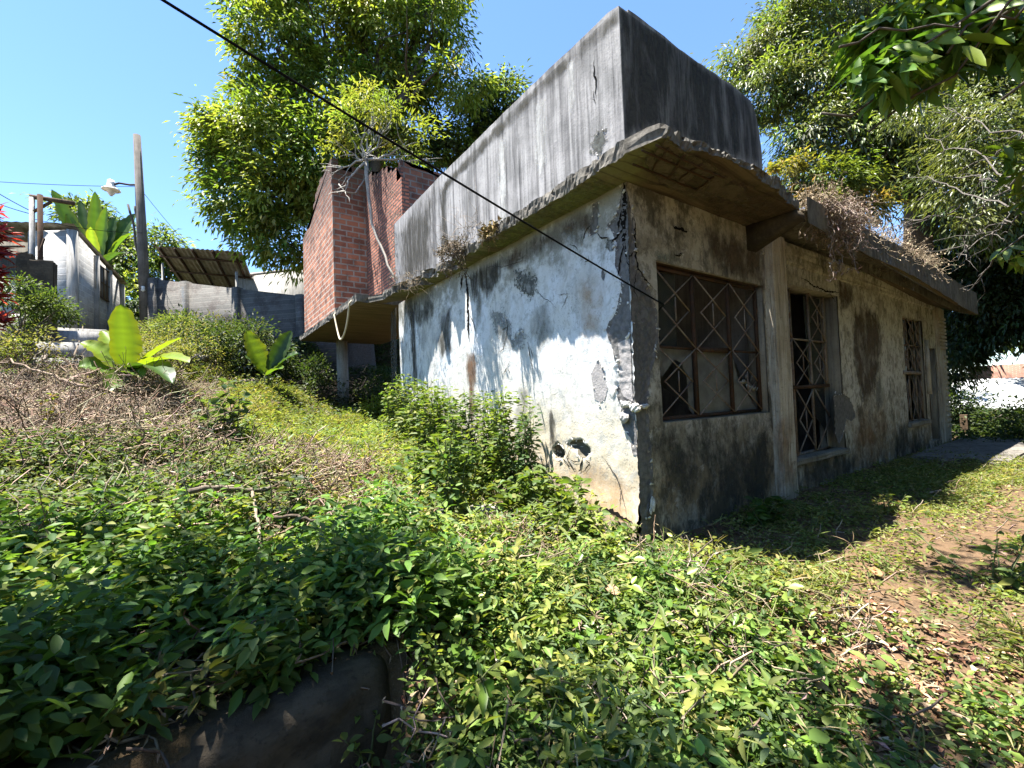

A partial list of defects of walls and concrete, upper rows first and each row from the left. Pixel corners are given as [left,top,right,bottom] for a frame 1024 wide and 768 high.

crack [591,62,599,101]
leakage [400,60,575,280]
leakage [470,237,552,312]
leakage [391,299,433,414]
leakage [439,311,451,356]
rust [467,355,476,420]
spalling [587,184,660,546]
leakage [839,280,881,407]
spalling [553,438,591,472]
leakage [654,433,768,506]